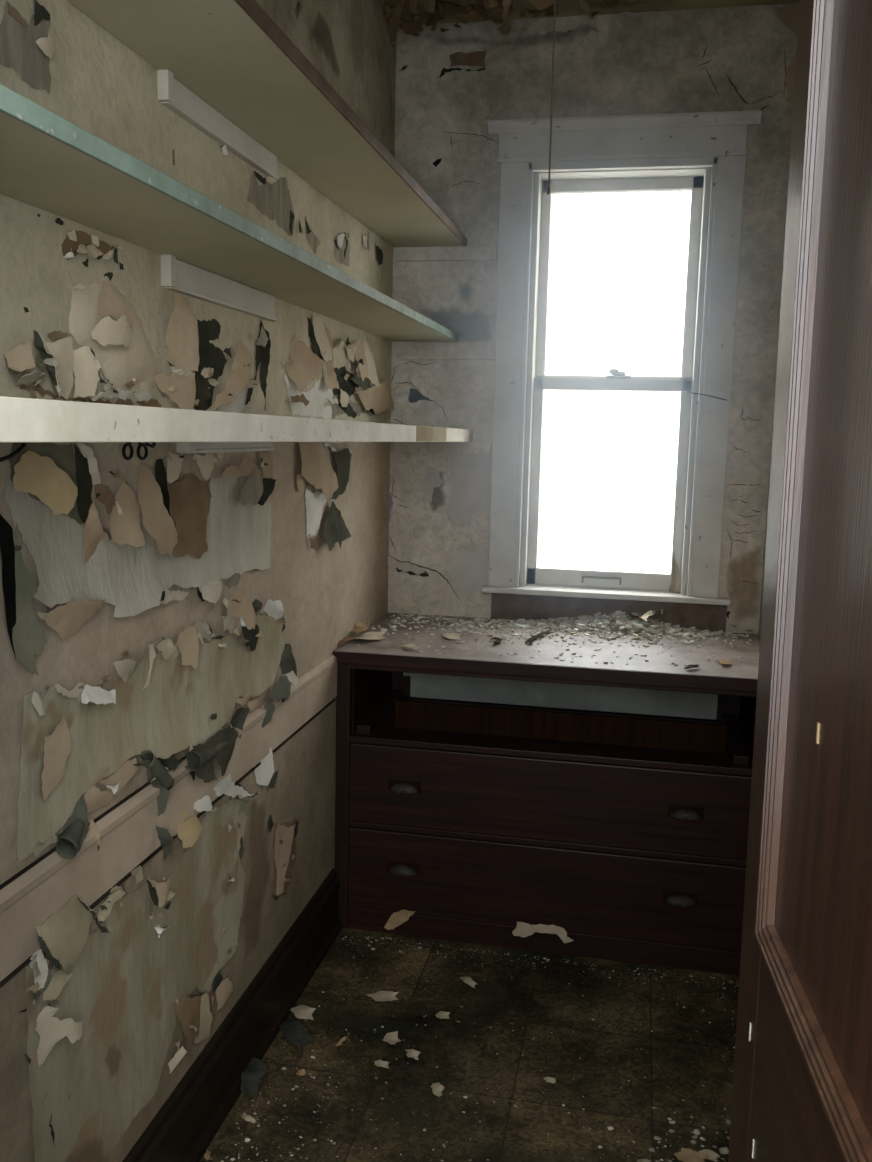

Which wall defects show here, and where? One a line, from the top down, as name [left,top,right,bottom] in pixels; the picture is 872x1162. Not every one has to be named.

flaking render [0,0,57,94]
flaking render [439,50,486,78]
peeling [55,218,124,281]
peeling [4,292,271,415]
peeling [285,316,393,419]
peeling [408,388,435,403]
peeling [297,442,352,551]
peeling [337,622,386,646]
peeling [0,442,300,1162]